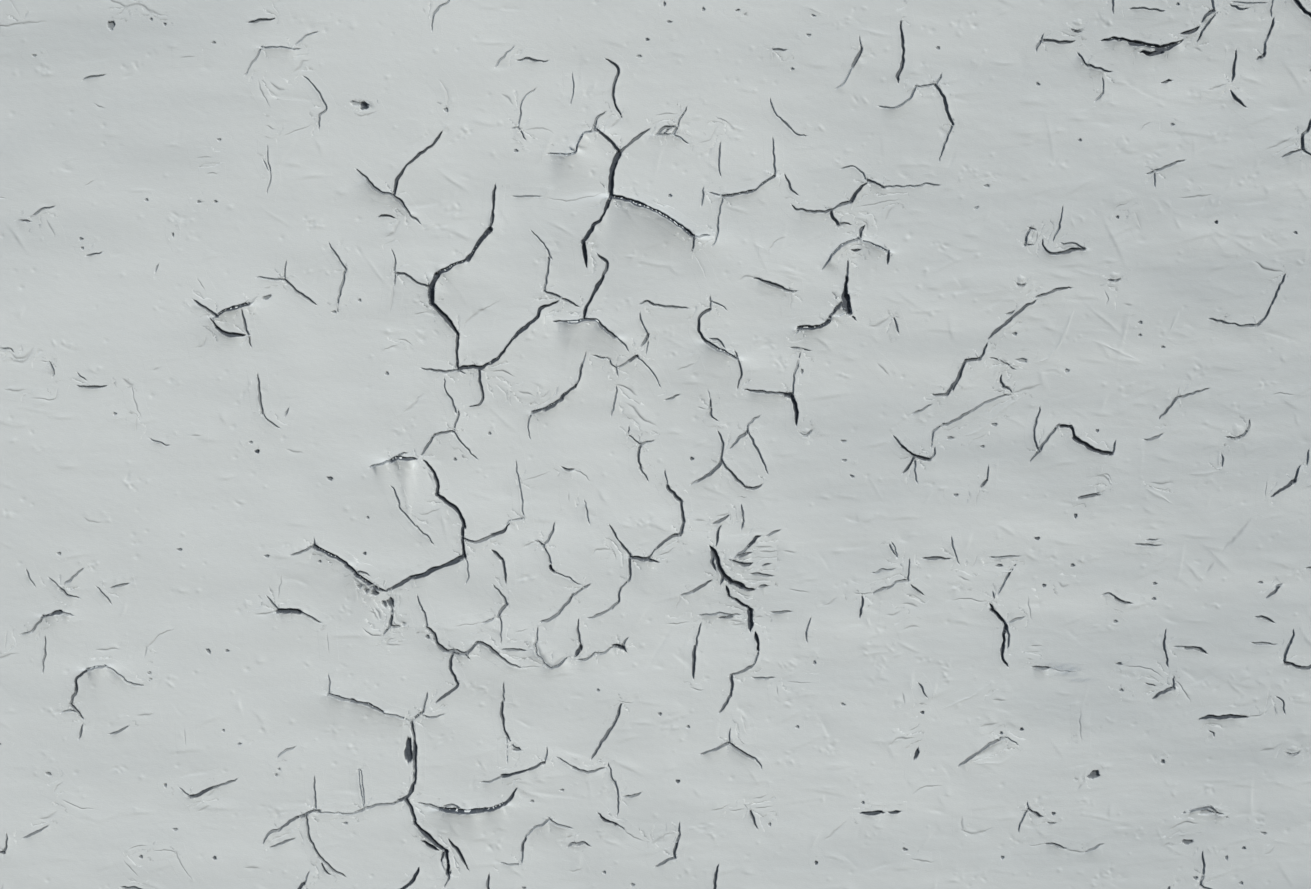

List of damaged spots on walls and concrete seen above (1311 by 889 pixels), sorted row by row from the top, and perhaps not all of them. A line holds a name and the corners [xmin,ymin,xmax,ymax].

crack [1284,0,1311,30]
peeling [645,97,698,156]
crack [1199,43,1311,170]
peeling [182,285,287,356]
crack [0,339,64,384]
crack [171,0,1217,889]
crack [13,557,151,748]
crack [0,826,16,863]